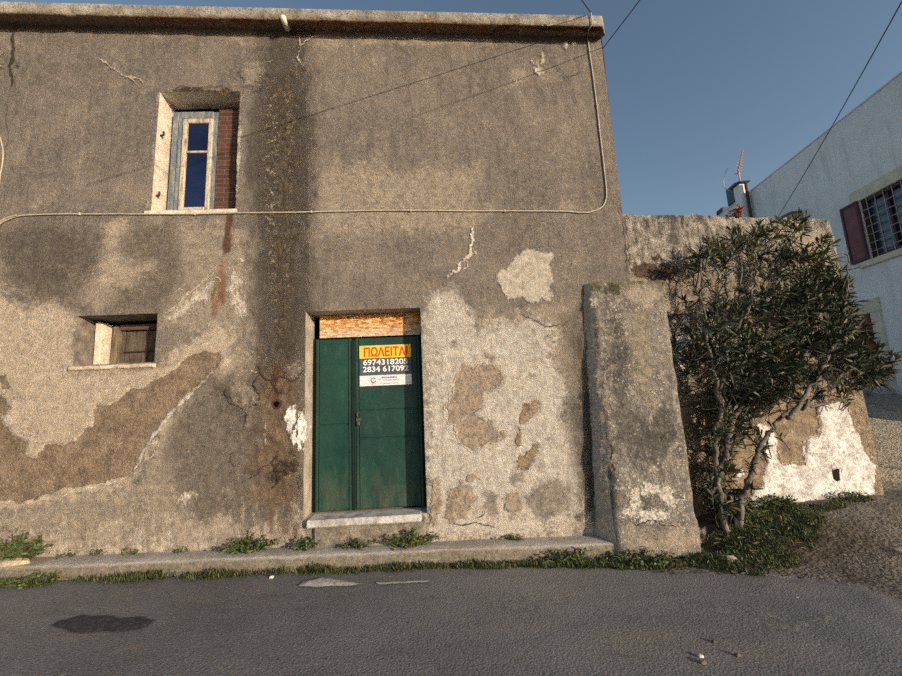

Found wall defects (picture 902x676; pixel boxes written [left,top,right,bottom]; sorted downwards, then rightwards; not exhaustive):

crack [99,58,143,83]
rust [222,214,233,253]
damp [248,40,308,524]
crack [448,228,477,277]
peeling [671,331,694,373]
spalling [0,350,222,504]
peeling [265,404,311,495]
spalling [443,353,505,453]
spalling [516,399,540,471]
peeling [718,401,877,507]
damp [173,513,231,544]